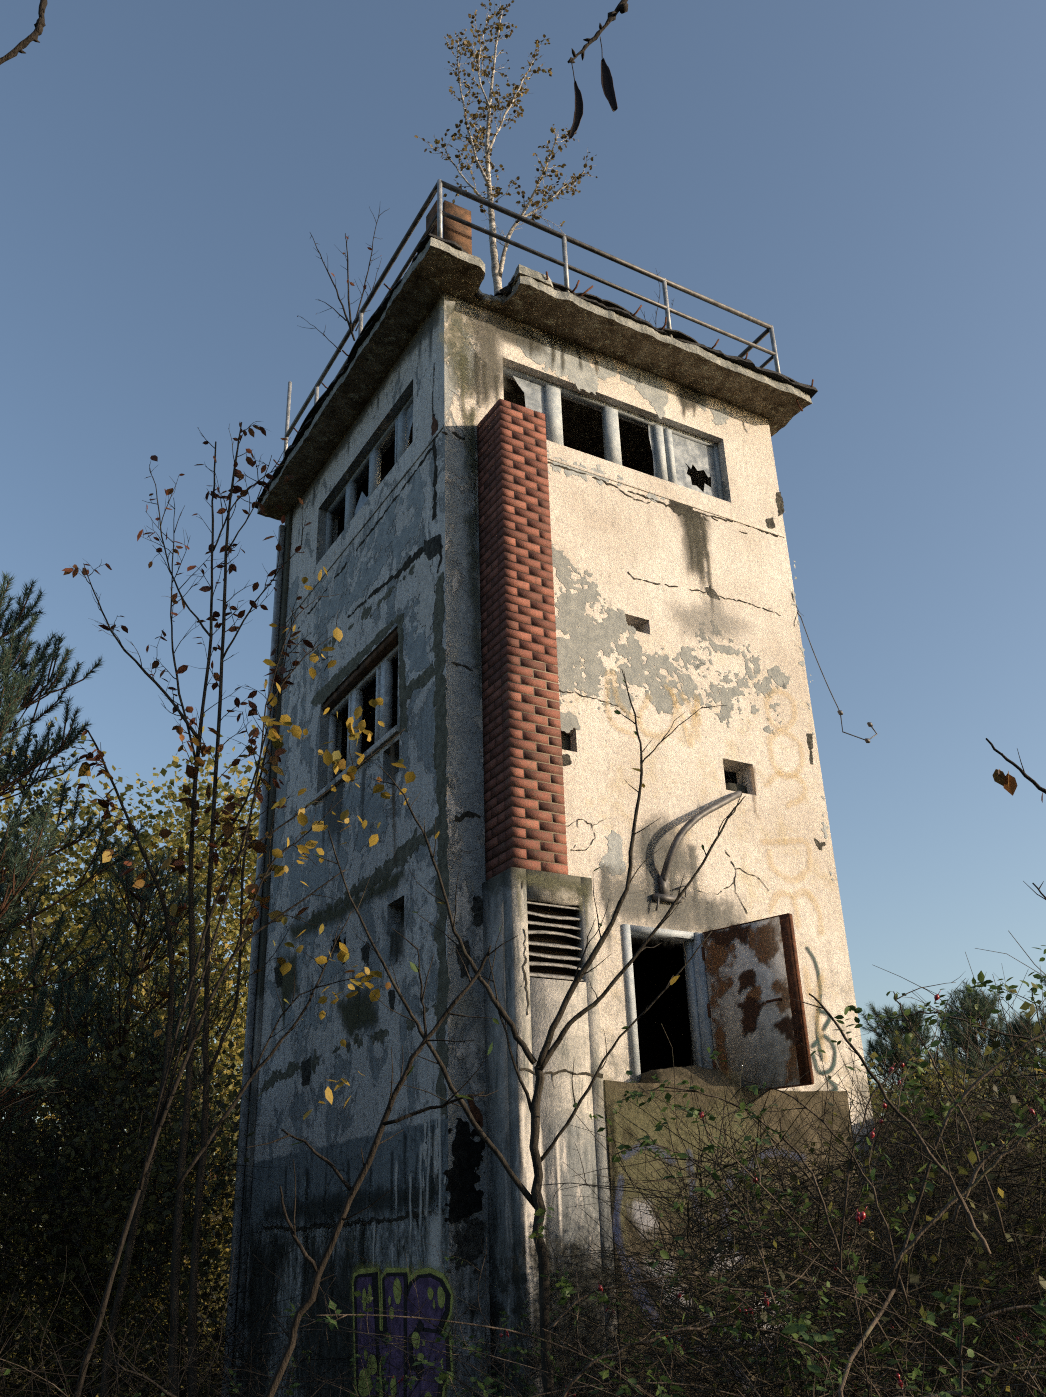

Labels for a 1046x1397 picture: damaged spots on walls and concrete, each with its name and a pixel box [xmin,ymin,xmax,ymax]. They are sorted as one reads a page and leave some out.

peeling [311,534,443,735]
crack [548,461,778,537]
peeling [551,540,813,735]
water stain [680,510,712,596]
crack [628,572,799,626]
peeling [267,576,397,1086]
peeling [814,795,834,890]
spalling [456,896,483,982]
rust [702,918,803,1085]
water stain [264,1098,442,1300]
spalling [422,1096,489,1276]
water stain [521,1103,562,1309]